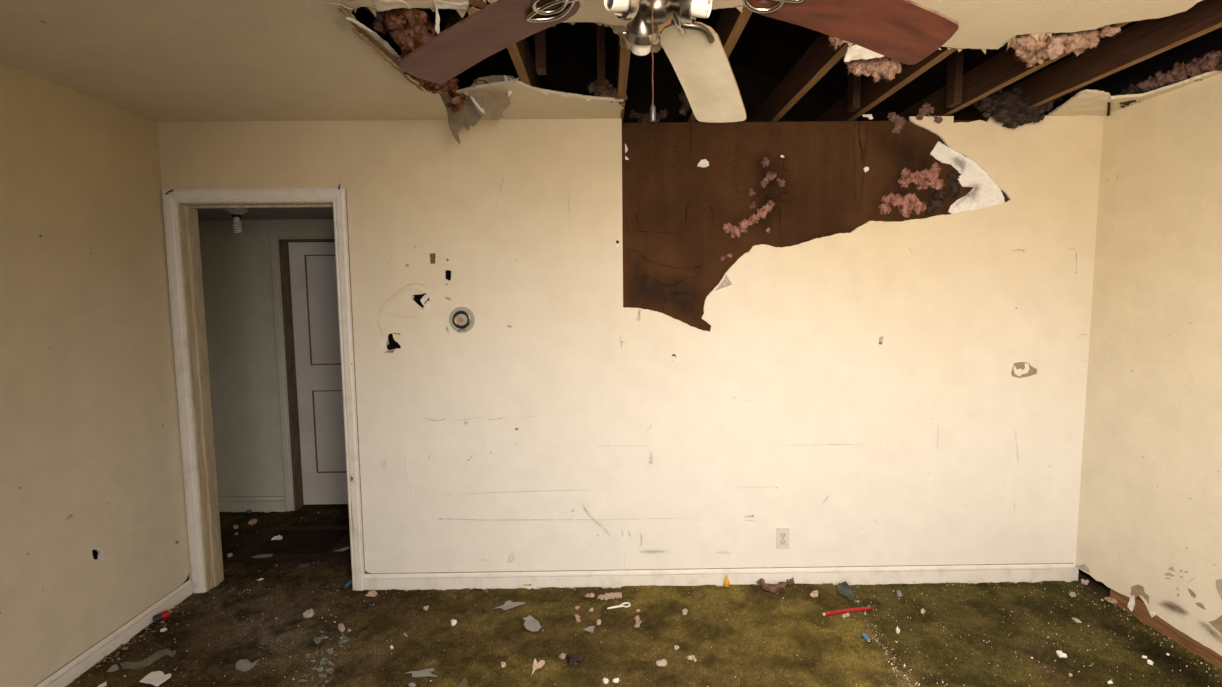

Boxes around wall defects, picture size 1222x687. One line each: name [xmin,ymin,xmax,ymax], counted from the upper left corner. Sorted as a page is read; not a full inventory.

peeling [596,23,631,50]
peeling [840,43,884,62]
peeling [307,0,519,145]
peeling [1048,90,1111,116]
peeling [930,141,1005,214]
peeling [430,253,451,301]
peeling [715,275,733,292]
spalling [411,293,430,309]
spalling [381,333,401,353]
spalling [1011,362,1037,378]
spalling [1127,584,1157,618]
peeling [1188,588,1222,634]